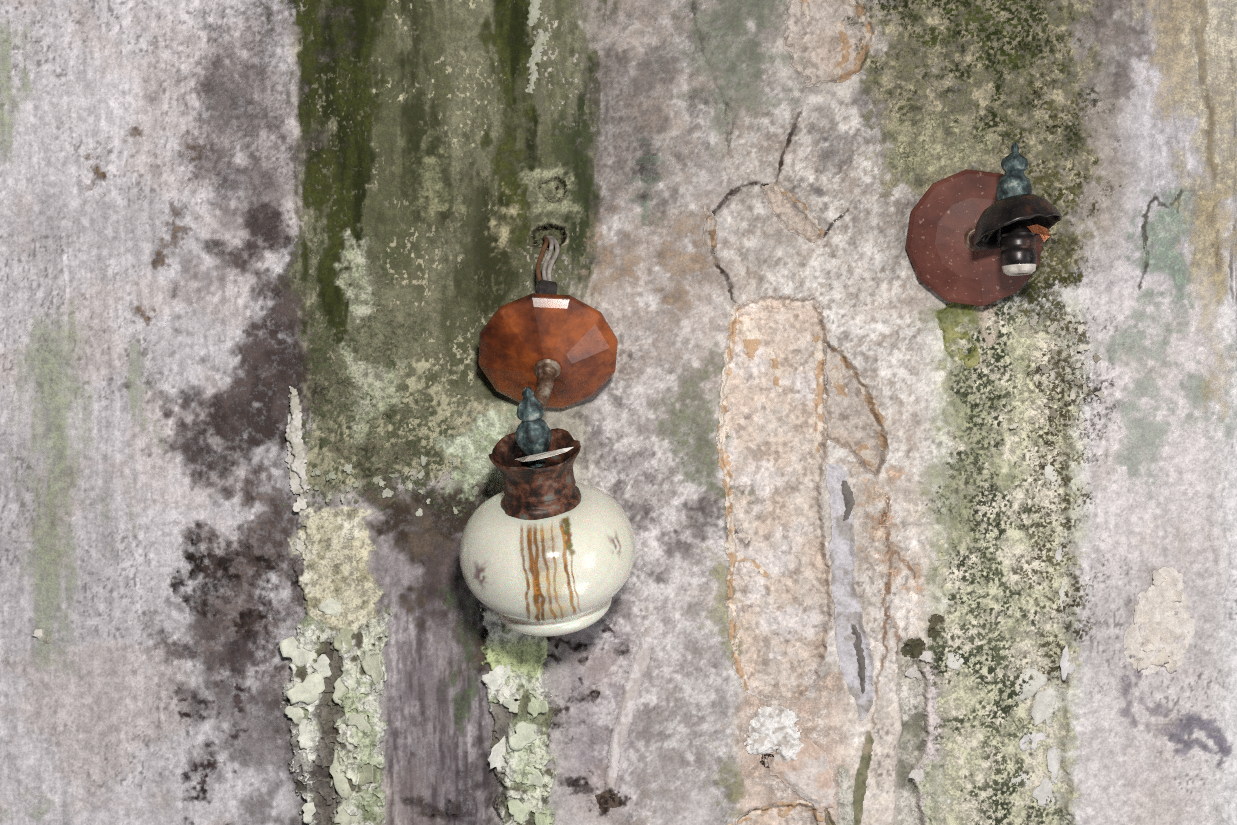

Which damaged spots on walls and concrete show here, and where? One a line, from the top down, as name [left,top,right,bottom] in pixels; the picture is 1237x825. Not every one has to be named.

crack [709,111,802,217]
leakage [152,209,186,269]
crack [714,258,733,300]
crack [823,215,844,238]
peeling [285,386,431,516]
leakage [161,0,659,825]
peeling [1124,567,1196,675]
peeling [279,579,394,825]
peeling [480,609,558,825]